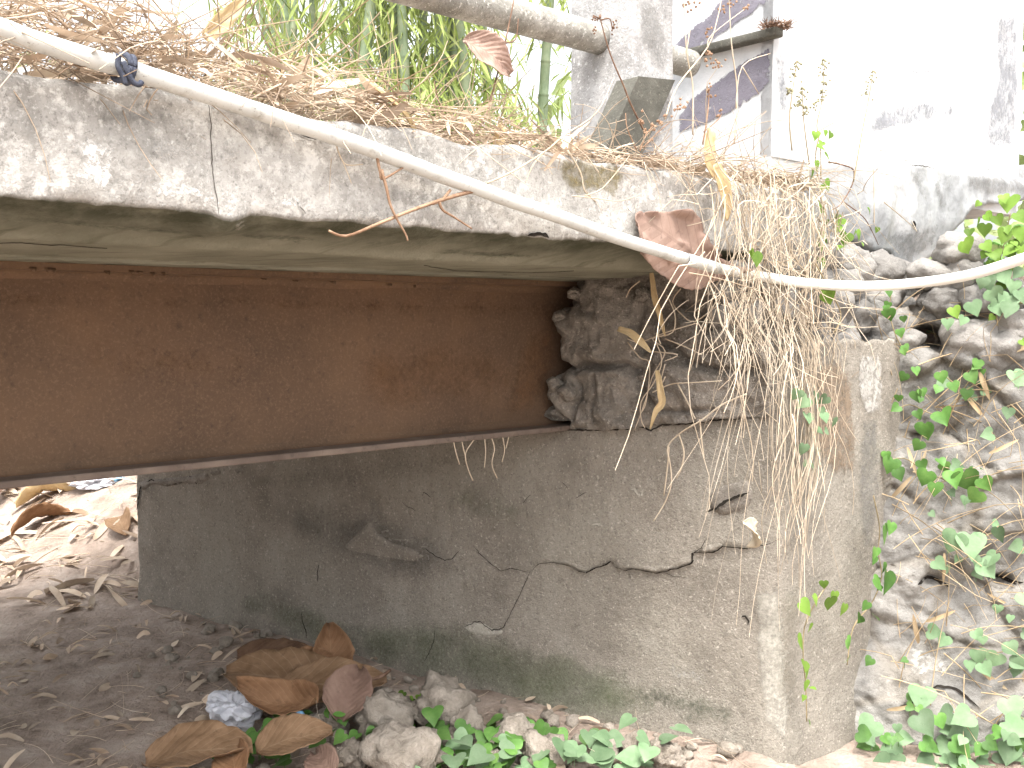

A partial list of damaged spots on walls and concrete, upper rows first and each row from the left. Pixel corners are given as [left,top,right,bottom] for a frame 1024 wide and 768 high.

crack [208,105,219,213]
crack [705,492,749,513]
crack [426,539,778,630]